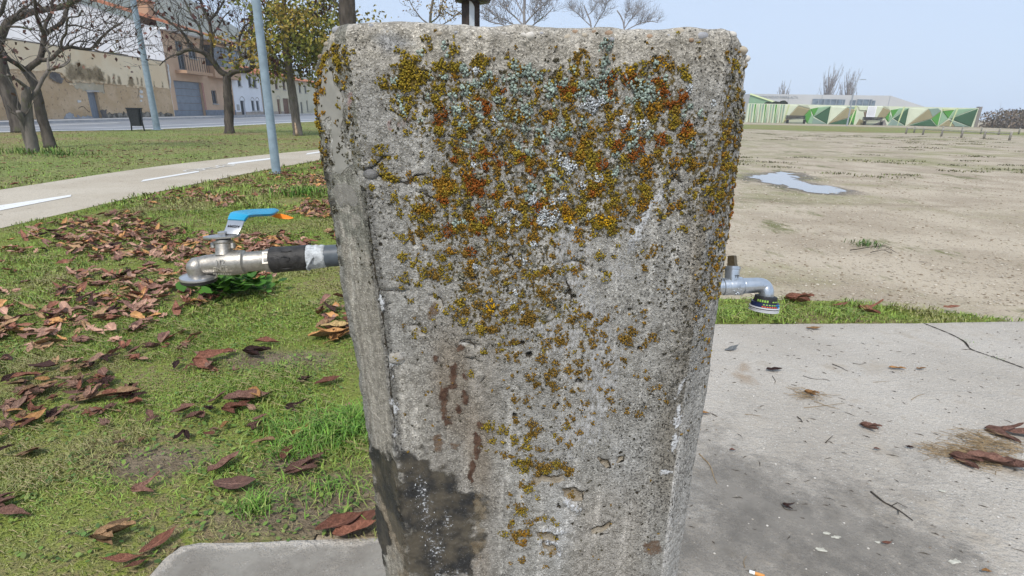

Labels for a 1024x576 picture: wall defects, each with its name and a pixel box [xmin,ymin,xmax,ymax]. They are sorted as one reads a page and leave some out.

rust [433,344,469,451]
crack [924,323,1023,368]
damp [158,434,487,576]
rust [467,422,484,483]